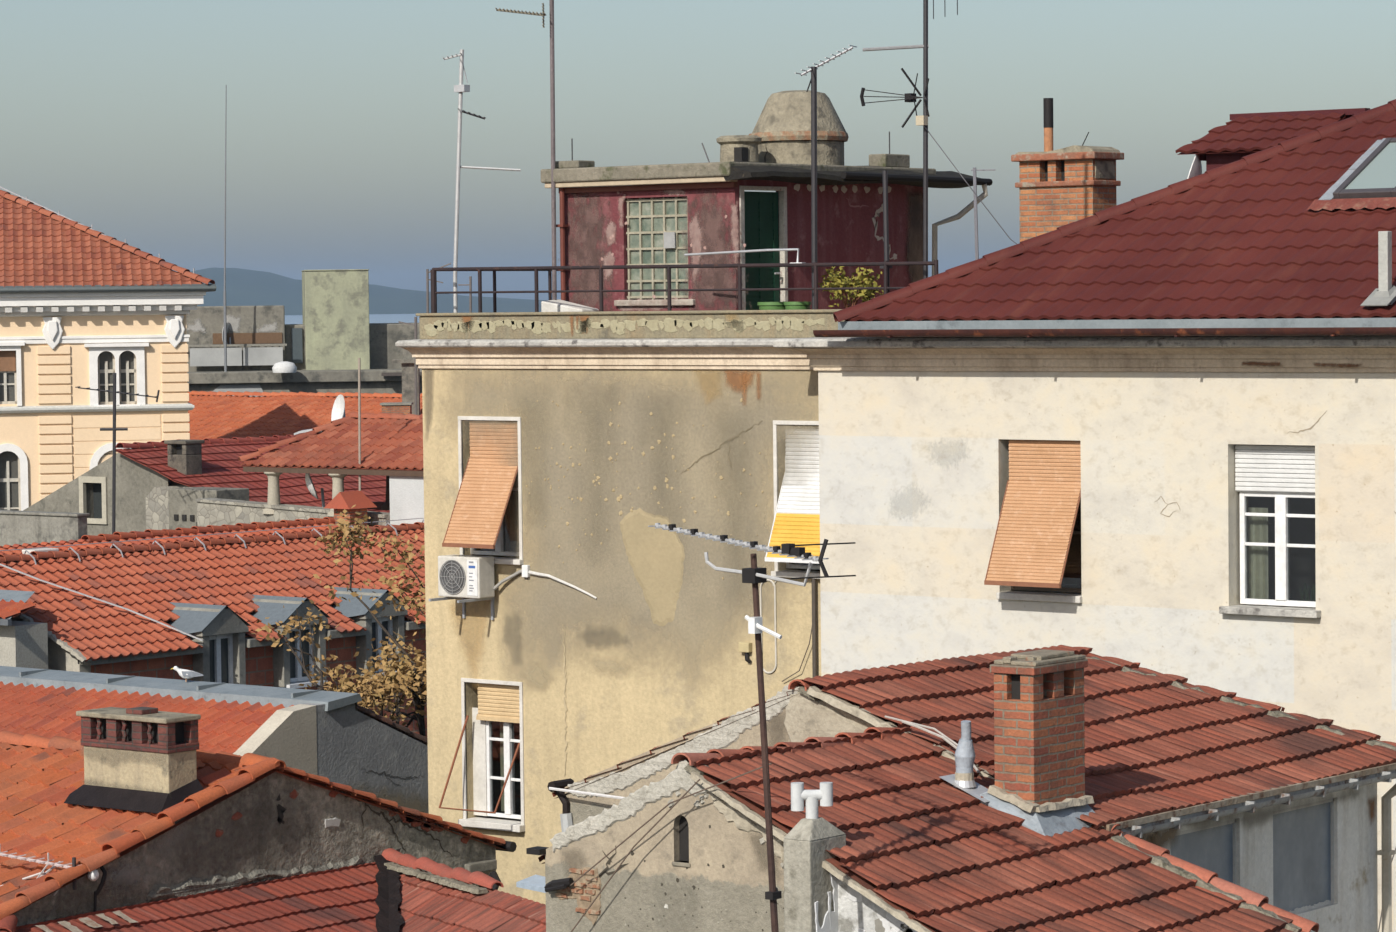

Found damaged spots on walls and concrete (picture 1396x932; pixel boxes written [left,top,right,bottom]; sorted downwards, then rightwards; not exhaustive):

peeling [601,191,628,277]
peeling [689,216,706,279]
peeling [794,184,897,260]
peeling [424,295,825,337]
rust [725,370,760,398]
crack [684,421,761,472]
water stain [468,370,817,661]
spalling [555,867,784,932]